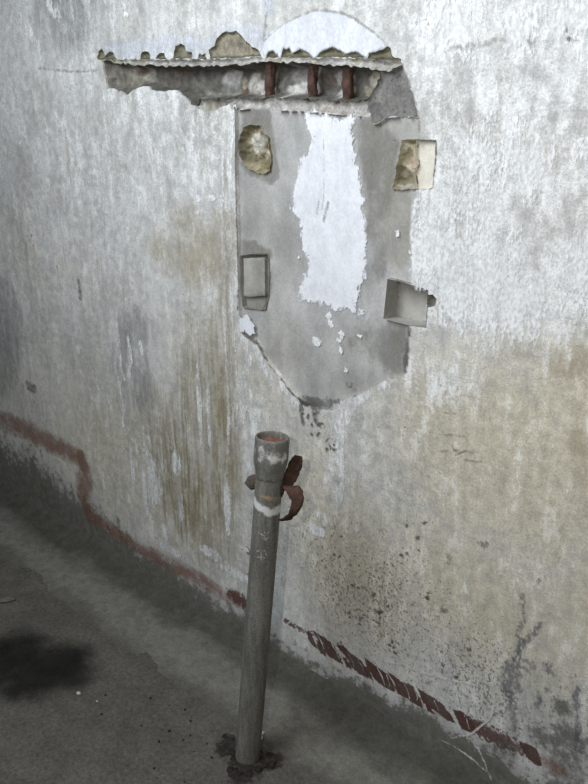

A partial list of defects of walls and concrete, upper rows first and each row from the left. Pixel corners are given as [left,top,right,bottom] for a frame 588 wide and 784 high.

corrosion [264,63,276,99]
corrosion [307,64,318,102]
corrosion [341,67,354,100]
spalling [97,31,418,354]
damp [503,618,540,727]
damp [539,686,588,769]